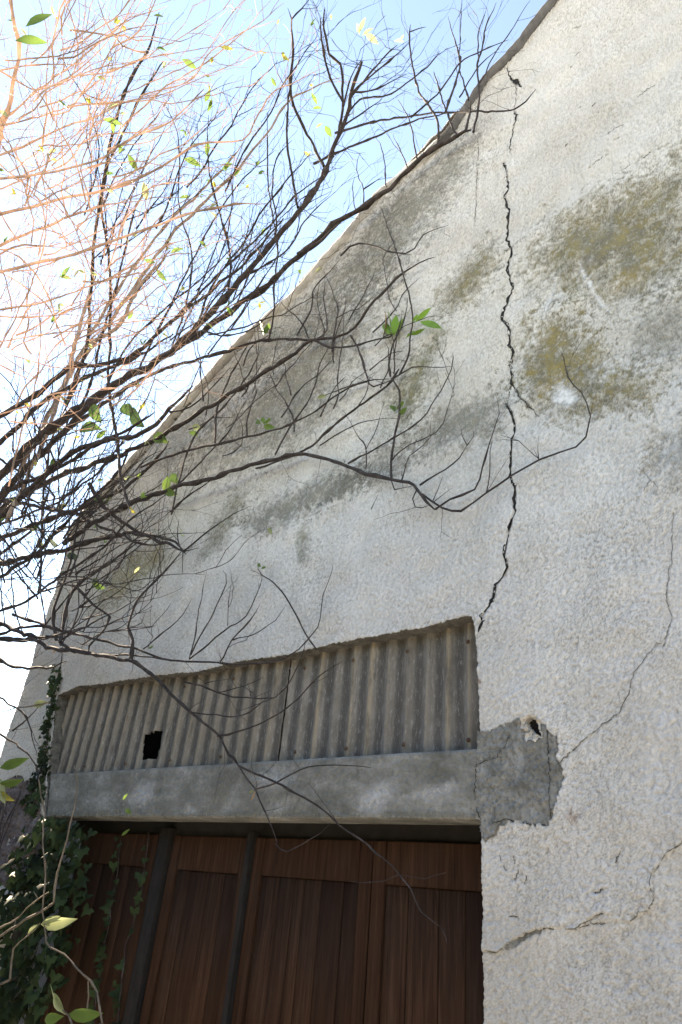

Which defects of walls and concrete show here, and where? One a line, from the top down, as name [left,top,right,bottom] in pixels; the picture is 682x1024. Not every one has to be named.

water stain [191,145,464,457]
crack [478,66,538,632]
water stain [552,382,578,408]
crack [557,512,674,764]
spalling [474,711,564,842]
crack [486,841,682,953]